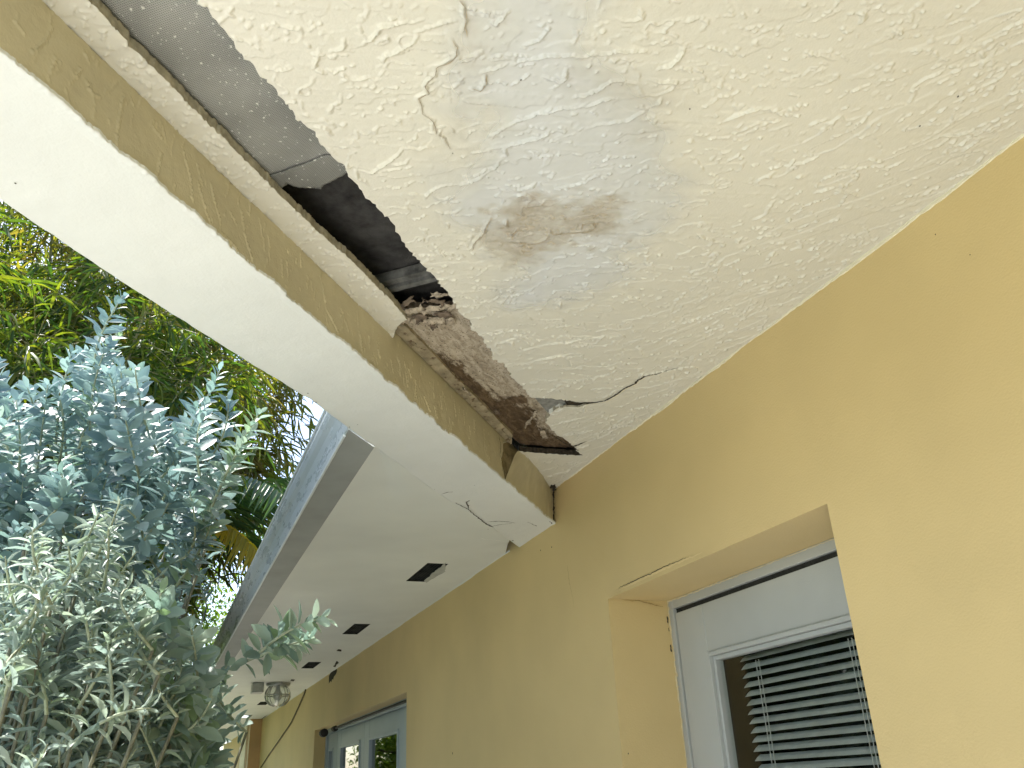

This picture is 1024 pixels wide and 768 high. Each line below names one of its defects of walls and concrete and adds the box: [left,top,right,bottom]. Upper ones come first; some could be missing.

crack [419,1,467,148]
peeling [400,292,457,331]
crack [562,368,676,405]
peeling [523,404,563,439]
crack [443,491,555,527]